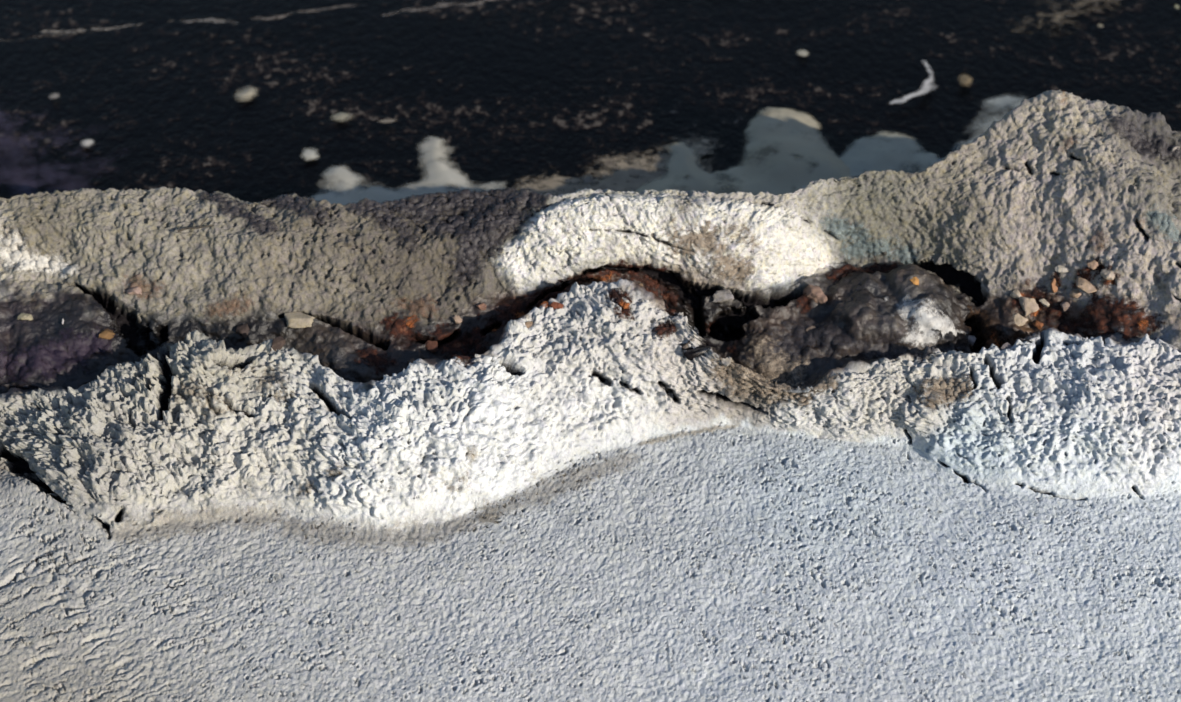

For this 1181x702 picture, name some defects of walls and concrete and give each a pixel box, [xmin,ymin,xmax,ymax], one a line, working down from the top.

damp [0,229,79,279]
rust [380,258,678,367]
rust [826,259,898,283]
rust [967,305,1010,353]
rust [1012,257,1165,341]
damp [0,327,111,388]
crack [0,447,66,503]
crack [102,511,122,535]